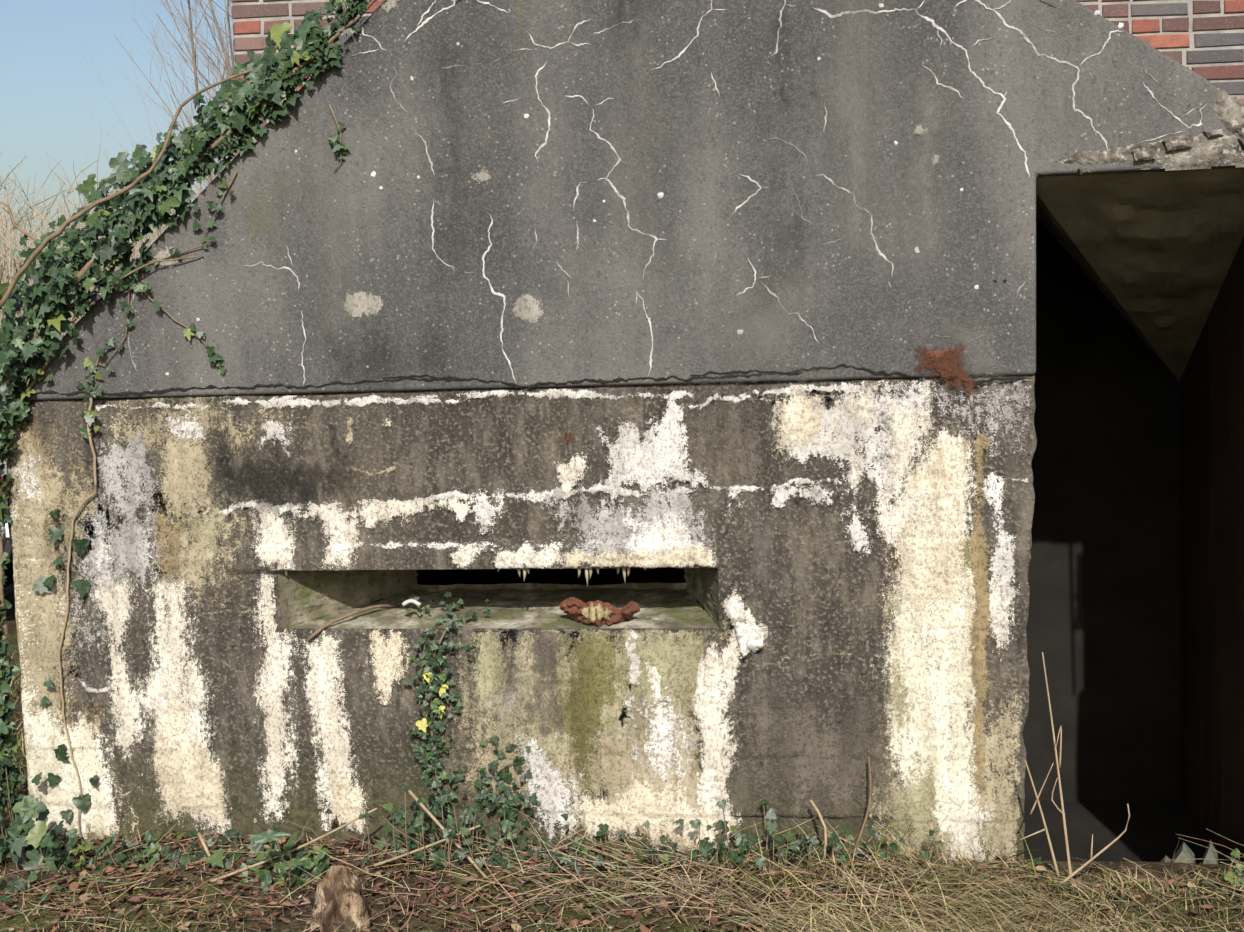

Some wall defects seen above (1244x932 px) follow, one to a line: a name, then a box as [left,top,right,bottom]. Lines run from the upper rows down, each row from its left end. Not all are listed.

crack [19,0,1031,397]
crack [773,0,1208,178]
spalling [1048,88,1244,176]
corrosion [915,344,976,395]
water stain [6,378,1032,862]